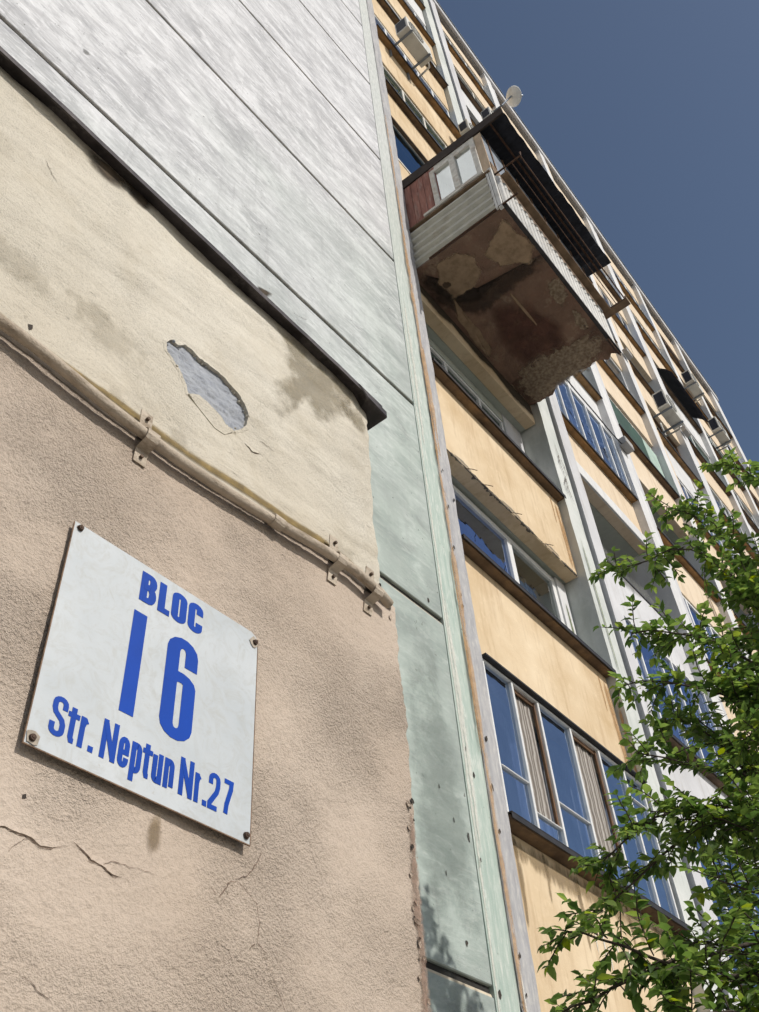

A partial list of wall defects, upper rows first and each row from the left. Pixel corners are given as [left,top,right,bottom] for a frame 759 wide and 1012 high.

leakage [426,258,536,312]
peeling [436,220,535,357]
spalling [163,337,251,435]
spalling [518,334,601,401]
crack [0,819,151,878]